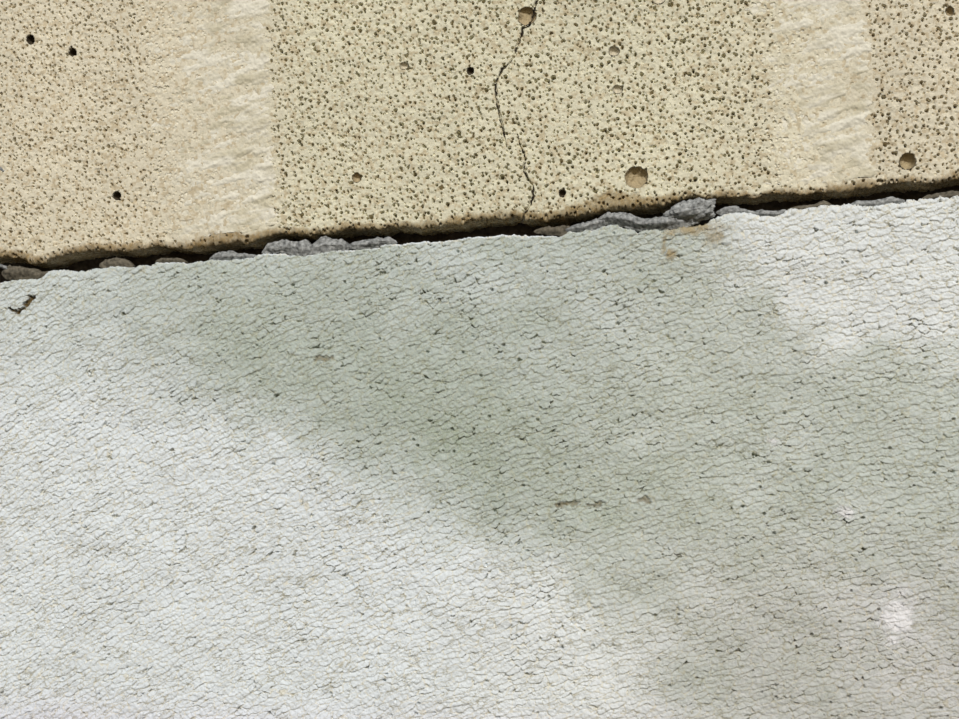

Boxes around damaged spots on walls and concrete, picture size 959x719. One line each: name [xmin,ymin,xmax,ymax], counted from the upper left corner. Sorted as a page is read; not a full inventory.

crack [494,0,544,223]